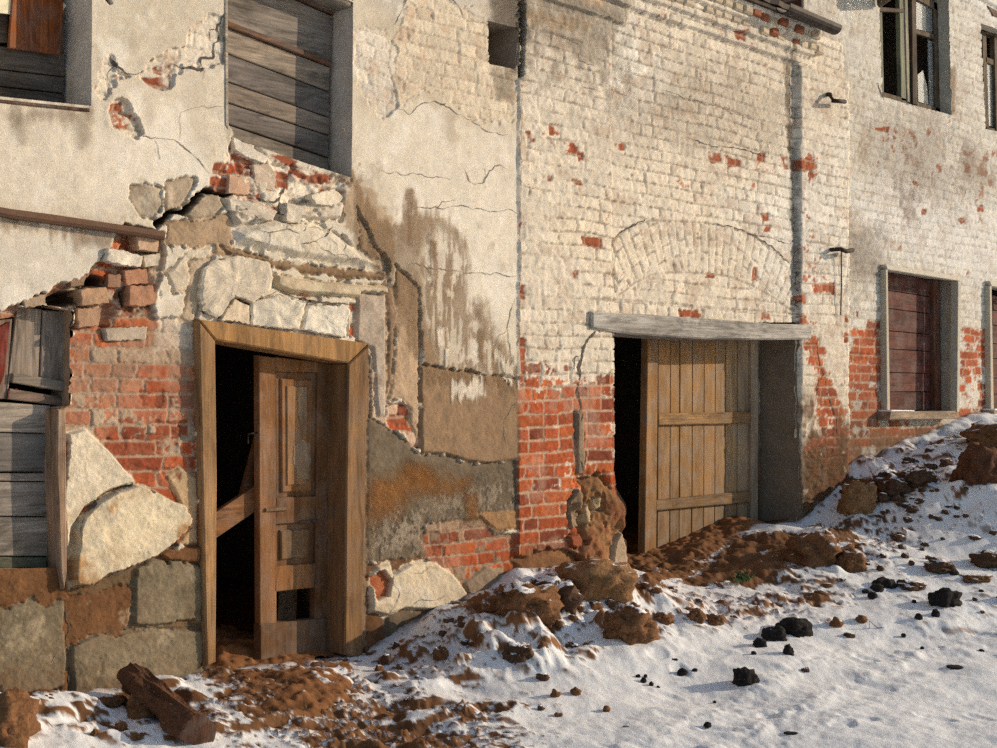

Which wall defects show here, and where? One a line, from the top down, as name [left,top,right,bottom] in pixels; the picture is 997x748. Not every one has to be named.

crack [106,57,139,85]
flaking render [94,13,223,139]
crack [171,14,225,79]
flaking render [354,0,520,126]
crack [141,106,365,270]
crack [384,0,527,379]
damp [351,172,521,403]
spalling [0,137,351,595]
crack [574,331,596,421]
spalling [810,332,887,458]
spalling [959,329,985,412]
flaking render [364,361,580,618]